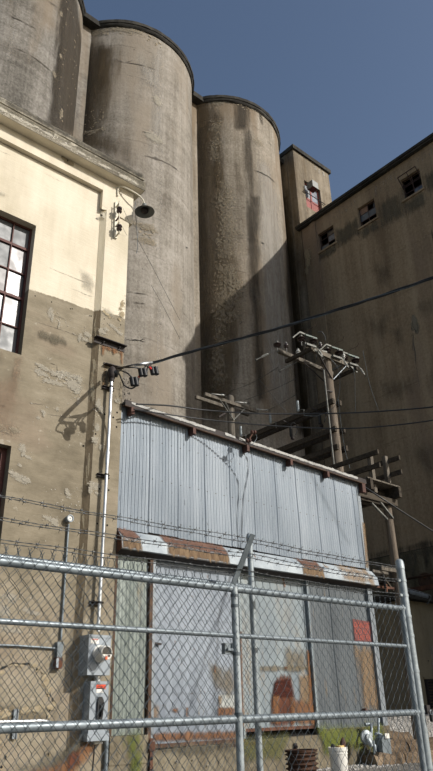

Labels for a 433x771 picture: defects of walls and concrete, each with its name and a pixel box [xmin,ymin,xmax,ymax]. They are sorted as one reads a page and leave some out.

damp [6,0,142,176]
damp [320,173,433,258]
damp [197,106,237,415]
peeling [47,298,126,342]
damp [247,197,264,400]
peeling [91,397,106,449]
peeling [8,444,32,485]
peeling [87,481,102,497]
corrosion [118,528,142,551]
corrosion [162,535,230,563]
corrosion [297,559,325,578]
corrosion [341,523,395,592]